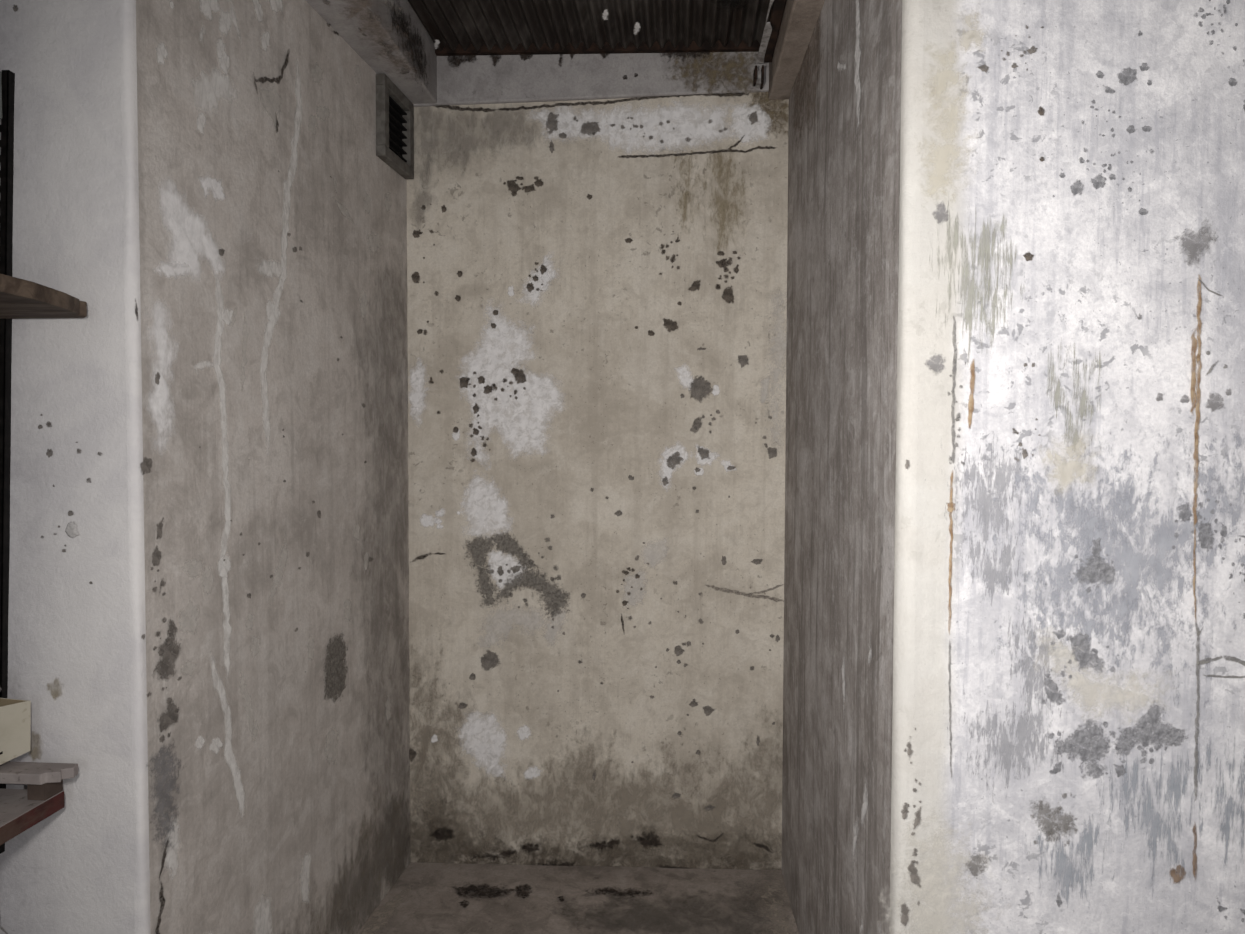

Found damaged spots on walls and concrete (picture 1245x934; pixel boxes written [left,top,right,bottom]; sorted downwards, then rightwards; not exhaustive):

crack [254,51,289,94]
crack [618,136,775,158]
leakage [944,220,1021,354]
leakage [148,303,176,450]
rust [1191,278,1202,621]
crack [711,585,781,602]
rust [947,472,955,632]
leakage [954,354,1245,788]
crack [1194,624,1245,800]
leakage [317,666,793,934]
leakage [1031,793,1103,904]
leakage [1111,747,1245,875]